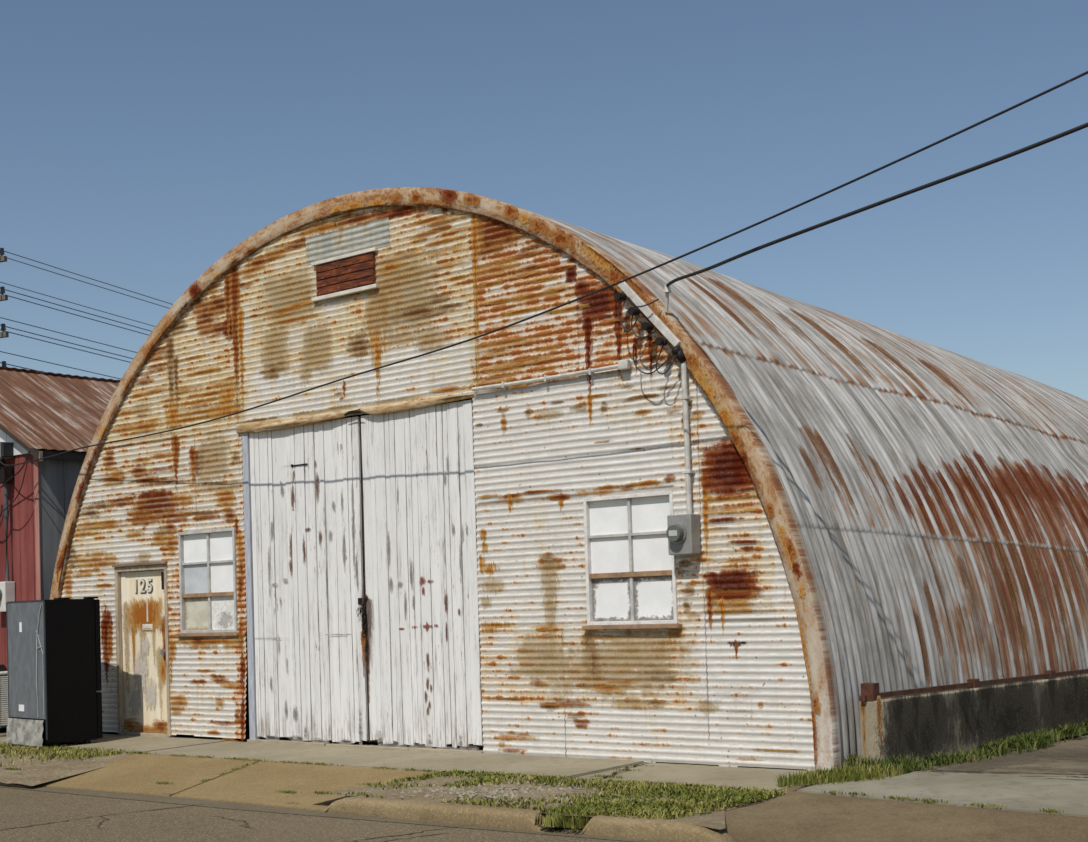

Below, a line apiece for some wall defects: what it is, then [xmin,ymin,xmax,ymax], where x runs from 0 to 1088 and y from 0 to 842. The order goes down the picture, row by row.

corrosion [56,189,821,765]
corrosion [799,425,858,513]
peeling [268,486,359,604]
peeling [387,531,460,642]
peeling [452,525,468,582]
corrosion [847,436,1088,685]
damp [510,631,688,698]
crack [918,769,1088,780]